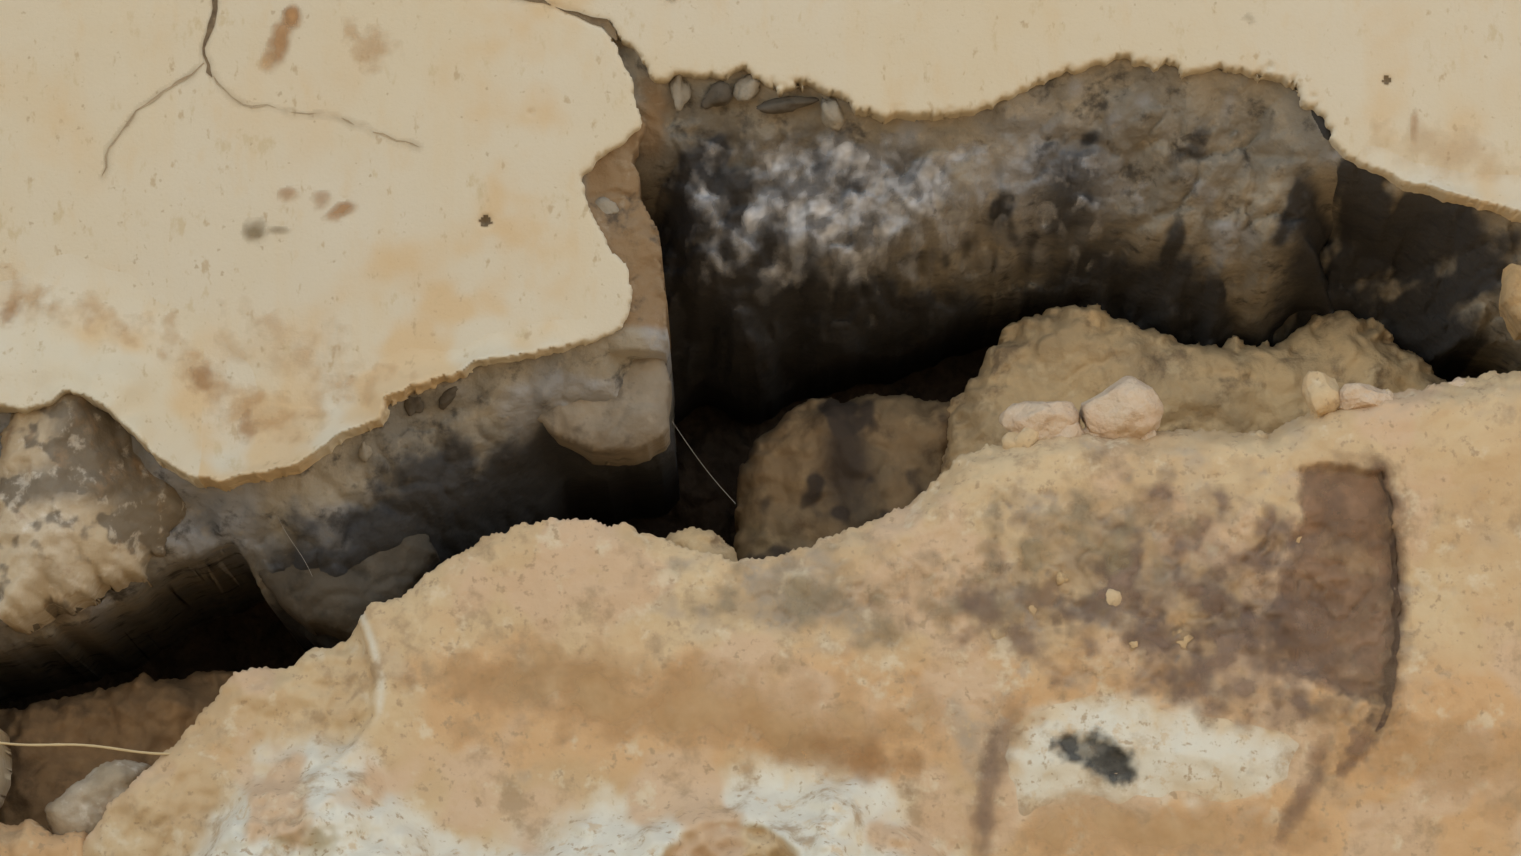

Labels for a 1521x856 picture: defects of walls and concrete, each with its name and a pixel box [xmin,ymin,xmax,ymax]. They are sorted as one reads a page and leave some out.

crack [102,0,418,175]
crack [526,0,617,40]
spalling [0,37,1521,704]
spalling [82,370,1521,856]